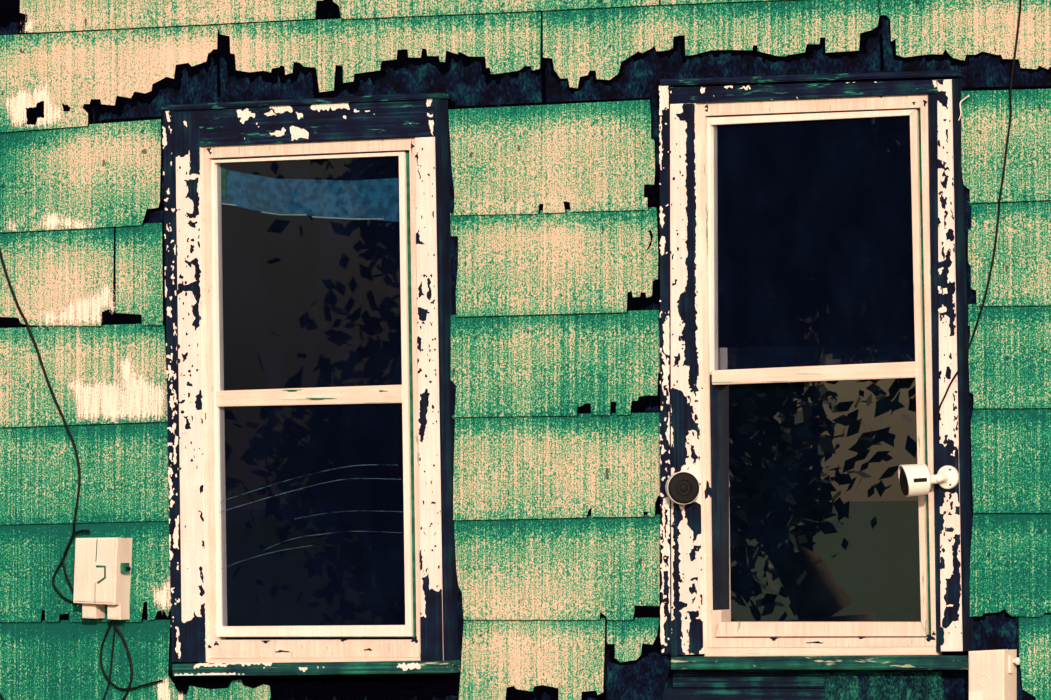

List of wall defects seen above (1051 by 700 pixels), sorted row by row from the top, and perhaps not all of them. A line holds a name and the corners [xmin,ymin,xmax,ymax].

peeling [162,111,289,676]
peeling [237,103,375,141]
peeling [397,274,443,671]
peeling [659,85,714,655]
peeling [912,80,969,337]
peeling [926,353,962,645]